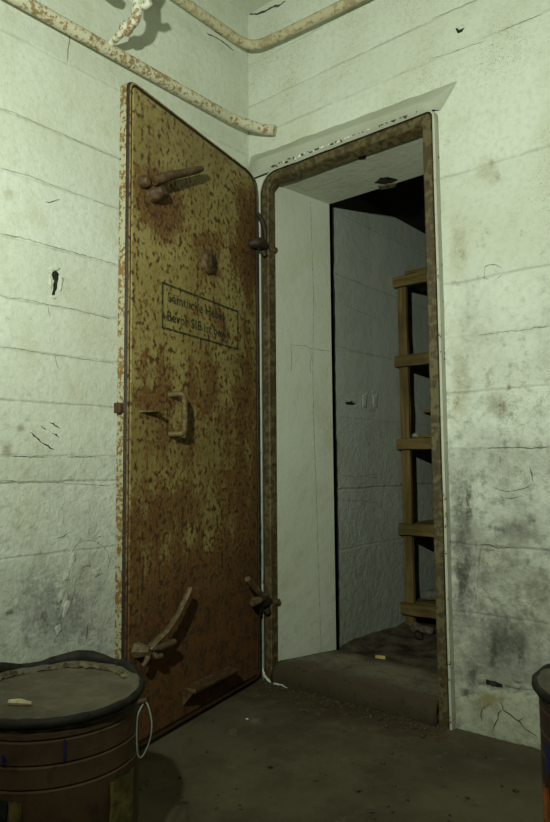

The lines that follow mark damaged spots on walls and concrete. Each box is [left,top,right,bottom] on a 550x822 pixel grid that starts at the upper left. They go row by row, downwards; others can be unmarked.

spalling [49,264,64,299]
crack [480,701,540,750]